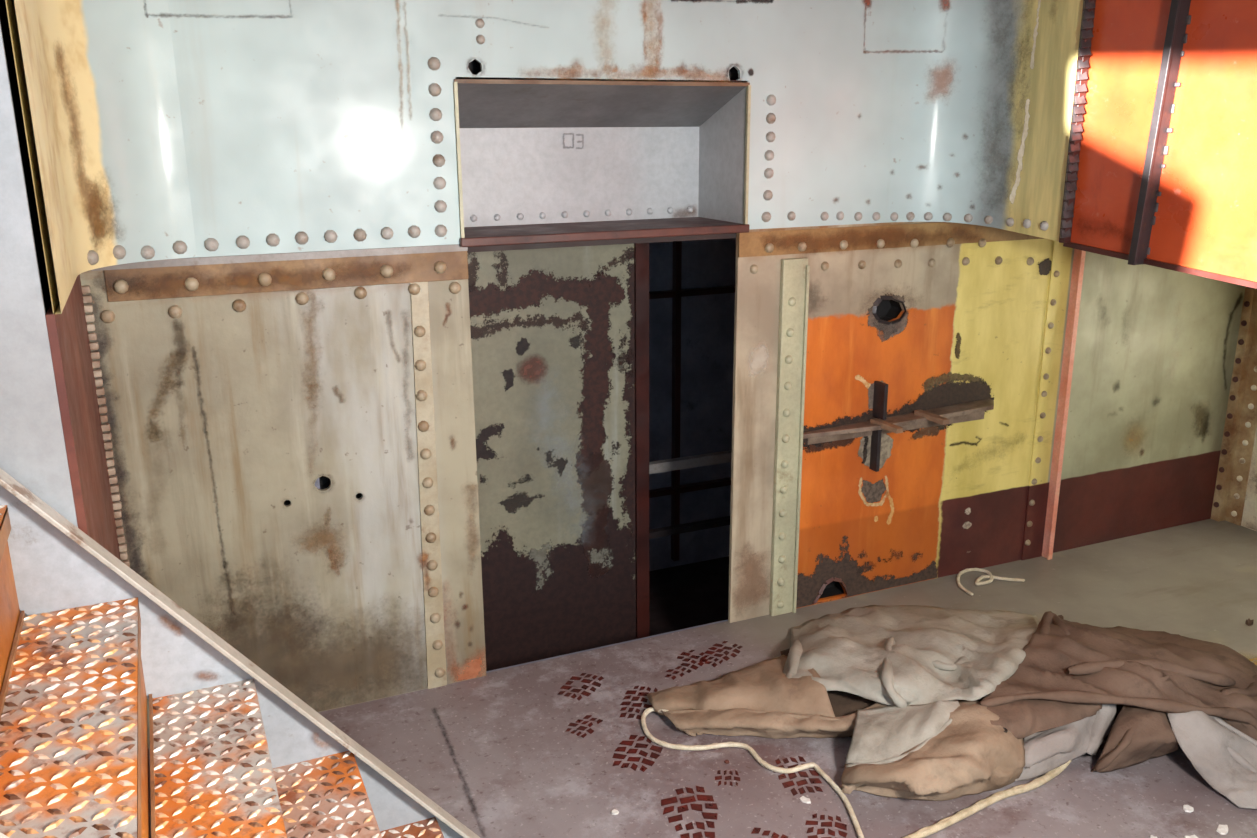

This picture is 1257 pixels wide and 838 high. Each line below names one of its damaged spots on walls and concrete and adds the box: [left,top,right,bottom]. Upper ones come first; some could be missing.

corrosion [64,87,108,237]
peeling [855,375,885,409]
peeling [468,247,636,671]
peeling [796,536,938,608]
water stain [219,612,407,709]